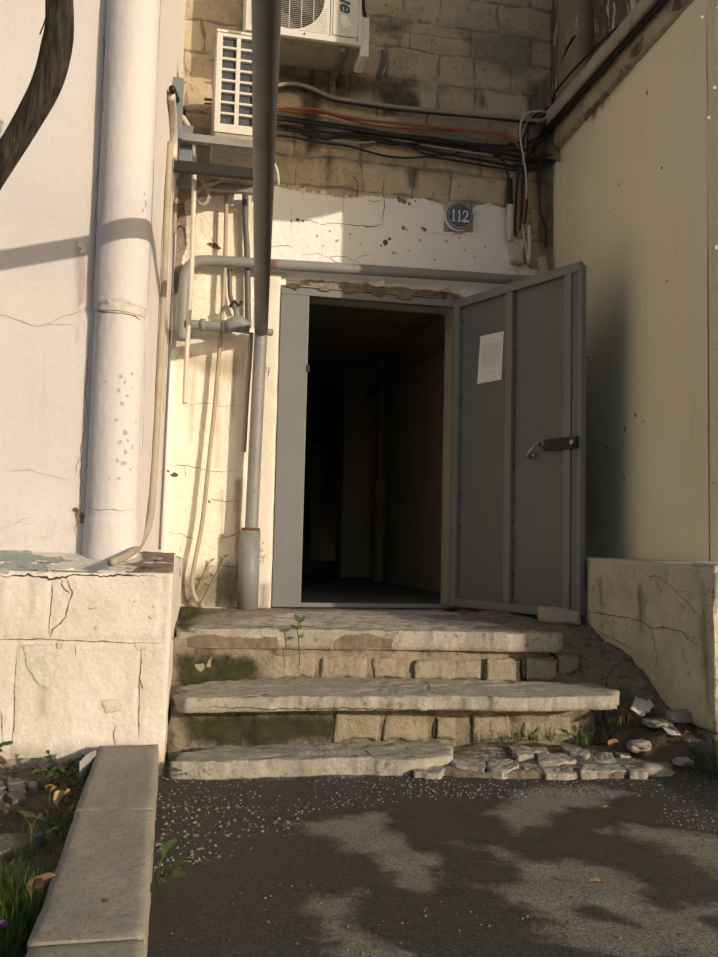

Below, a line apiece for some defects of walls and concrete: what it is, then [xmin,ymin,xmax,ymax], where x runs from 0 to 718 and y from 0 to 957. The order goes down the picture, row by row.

crack [274,173,385,263]
spalling [286,278,464,301]
flaking render [72,508,85,523]
crack [0,308,174,747]
peeling [0,550,190,581]
crack [585,556,718,747]